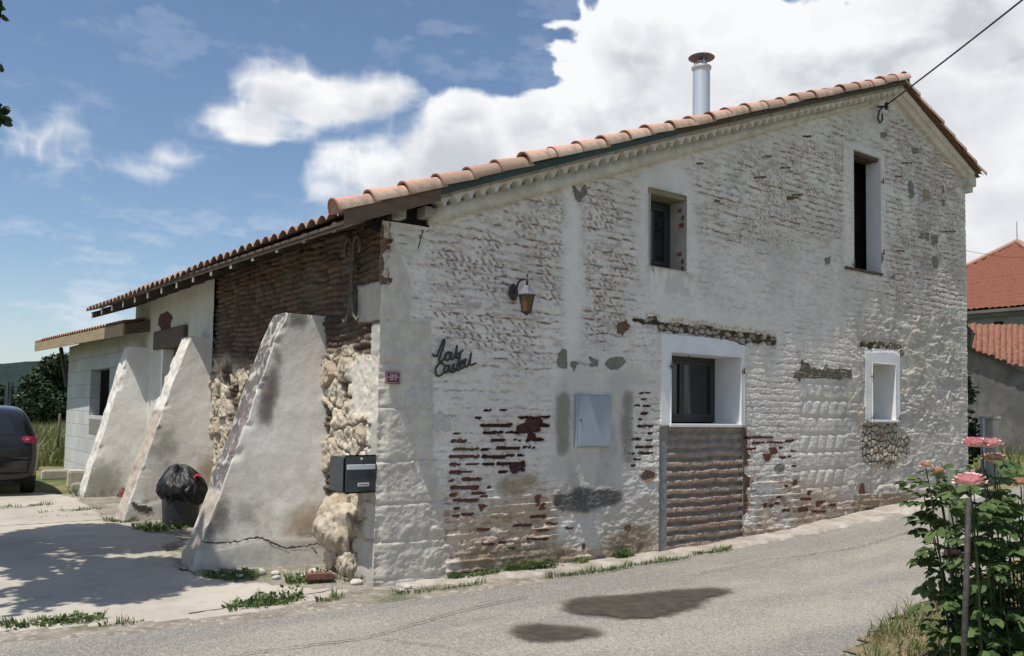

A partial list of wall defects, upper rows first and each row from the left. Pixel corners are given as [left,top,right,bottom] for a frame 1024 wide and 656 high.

spalling [617,320,630,336]
peeling [557,349,626,371]
spalling [631,392,656,482]
spalling [448,409,550,550]
spalling [743,428,797,516]
leakage [554,488,622,513]
spalling [763,480,837,513]
spalling [513,495,574,541]
crack [200,536,320,553]